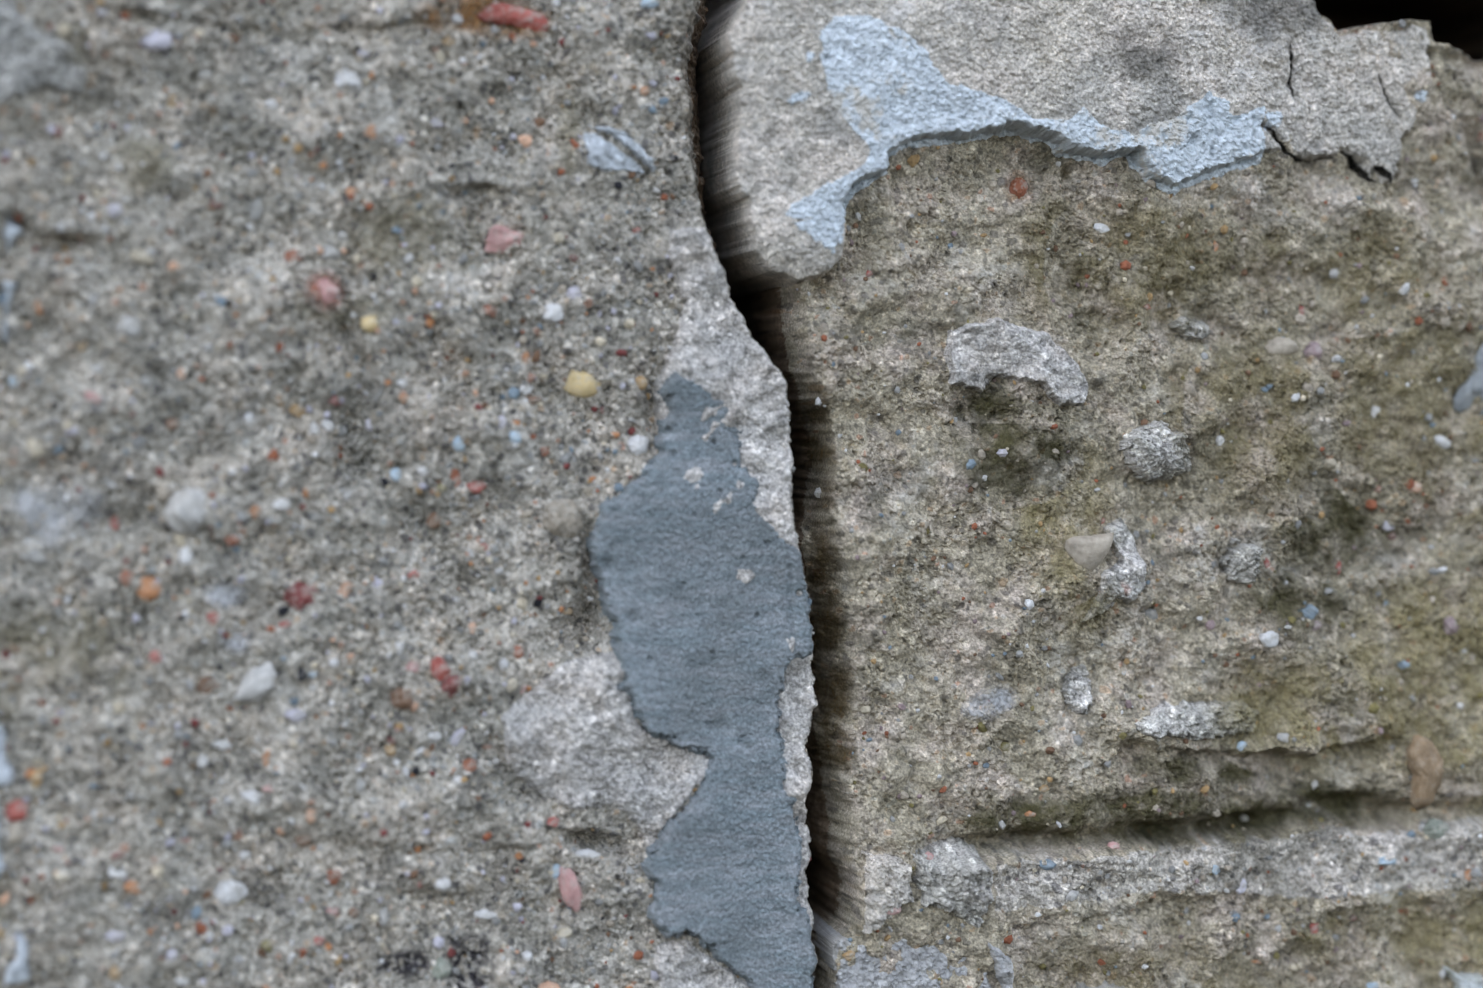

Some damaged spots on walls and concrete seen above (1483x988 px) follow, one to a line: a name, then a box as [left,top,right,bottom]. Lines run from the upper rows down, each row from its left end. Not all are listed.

crack [687,0,716,250]
spalling [1465,111,1483,199]
crack [730,287,813,627]
peeling [501,0,1432,988]
crack [805,663,842,975]
crack [980,810,1280,866]
crack [1121,733,1372,768]
crack [1345,805,1423,837]